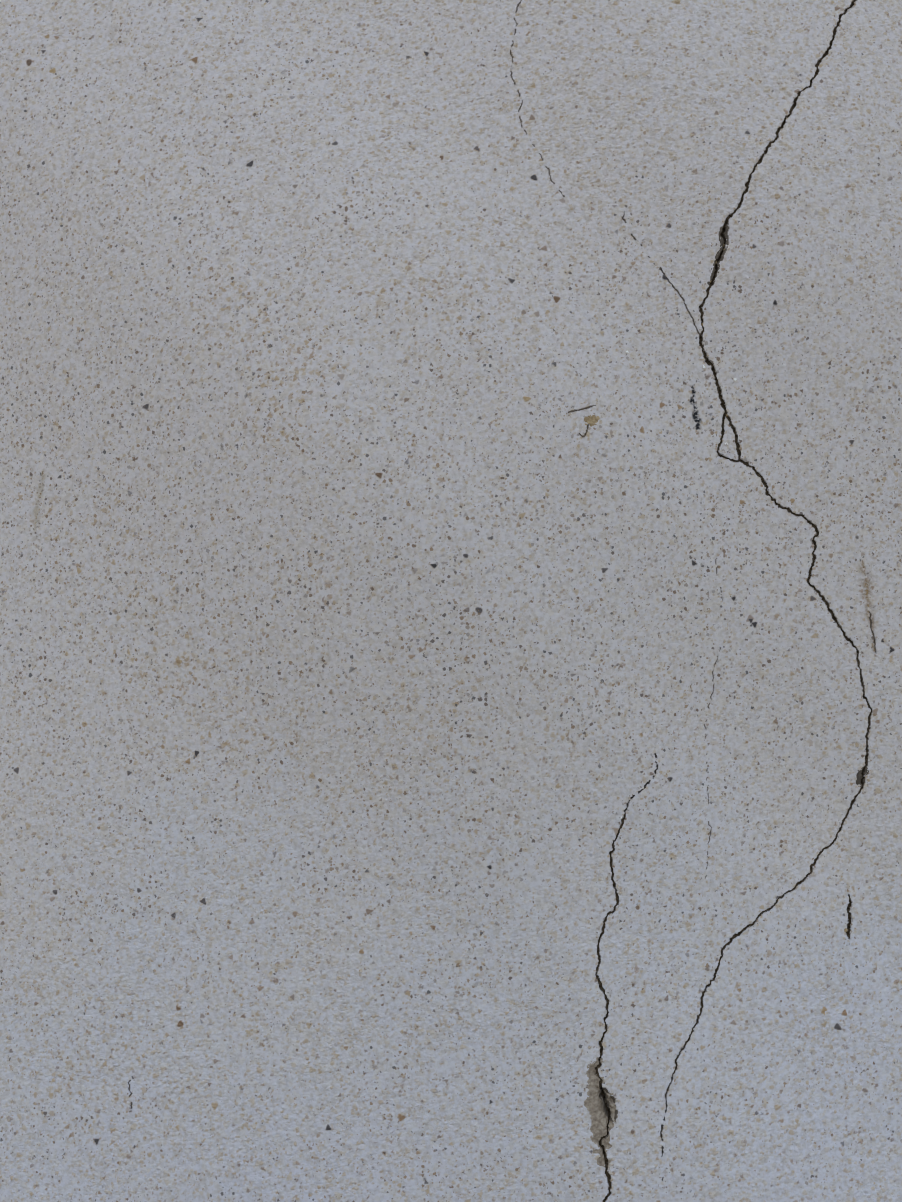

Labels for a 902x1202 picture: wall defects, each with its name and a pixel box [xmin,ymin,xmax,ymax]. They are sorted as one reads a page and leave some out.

crack [595,754,658,1202]
crack [622,0,872,1180]